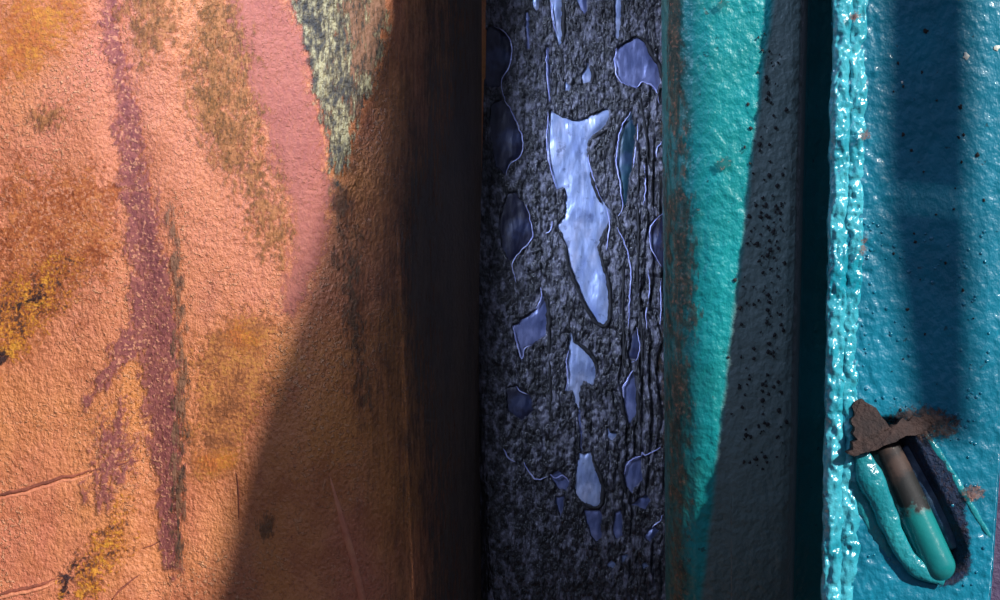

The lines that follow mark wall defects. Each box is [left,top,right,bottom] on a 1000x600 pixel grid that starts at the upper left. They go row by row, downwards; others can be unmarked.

peeling [485,26,524,176]
peeling [614,0,662,104]
peeling [525,0,636,329]
peeling [500,192,534,281]
peeling [648,212,663,267]
peeling [512,287,552,359]
corrosion [656,0,704,600]
crack [0,460,139,500]
peeling [550,333,622,541]
peeling [620,327,641,429]
peeling [619,447,661,509]
corrosion [884,403,961,443]